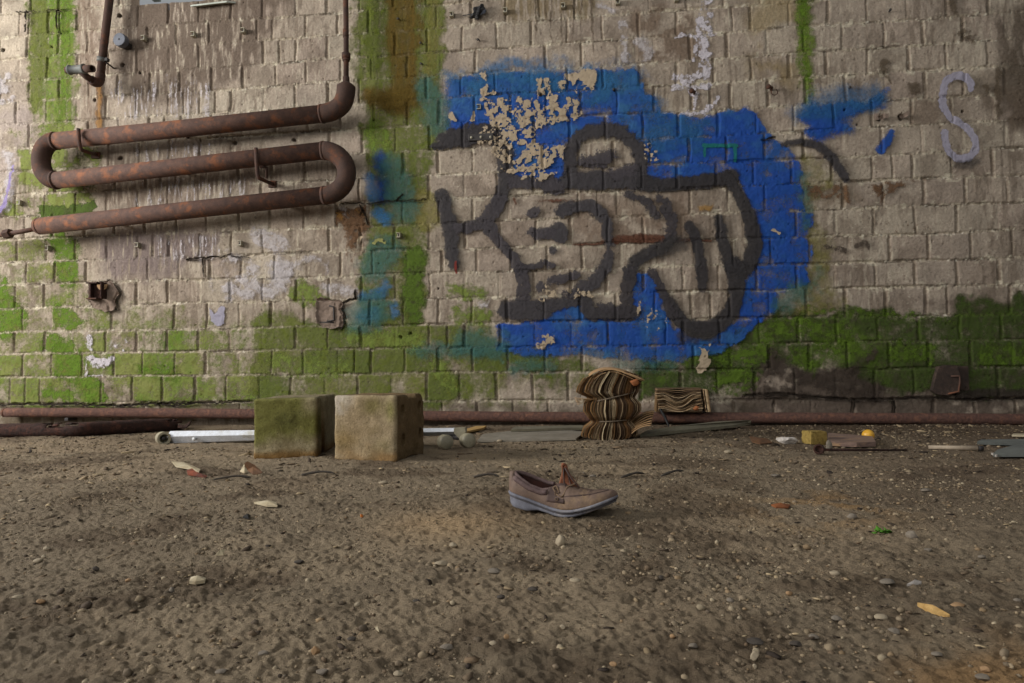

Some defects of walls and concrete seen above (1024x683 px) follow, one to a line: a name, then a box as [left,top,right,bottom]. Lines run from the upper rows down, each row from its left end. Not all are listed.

damp [360,0,438,163]
peeling [448,68,597,182]
corrosion [335,205,370,262]
damp [85,334,126,376]
damp [748,348,885,405]